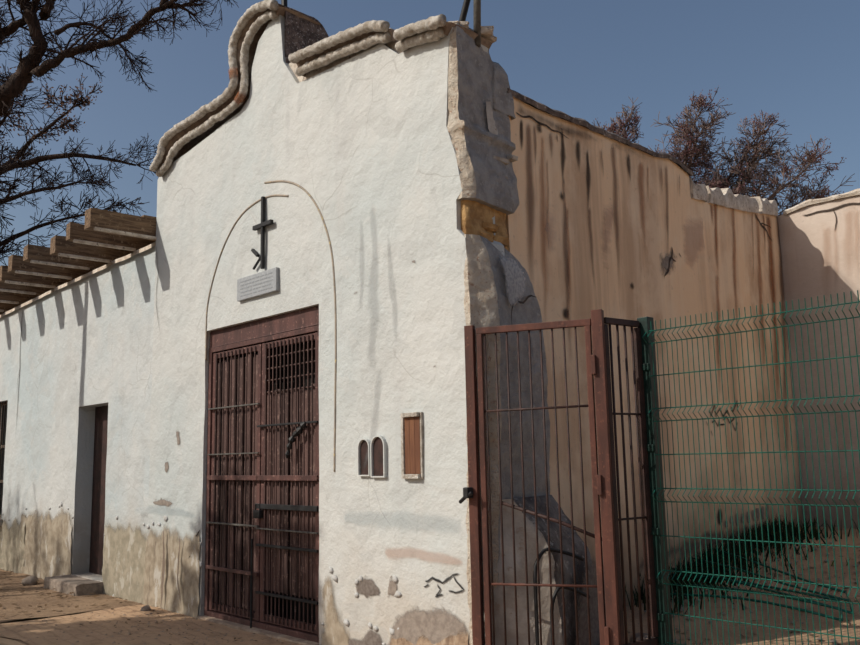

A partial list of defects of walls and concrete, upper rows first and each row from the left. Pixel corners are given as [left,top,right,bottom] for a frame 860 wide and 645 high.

damp [520,109,536,239]
crack [516,112,566,142]
damp [550,127,590,199]
damp [601,149,618,239]
crack [803,203,860,229]
crack [664,248,681,278]
spalling [102,498,202,618]
spalling [321,567,468,645]